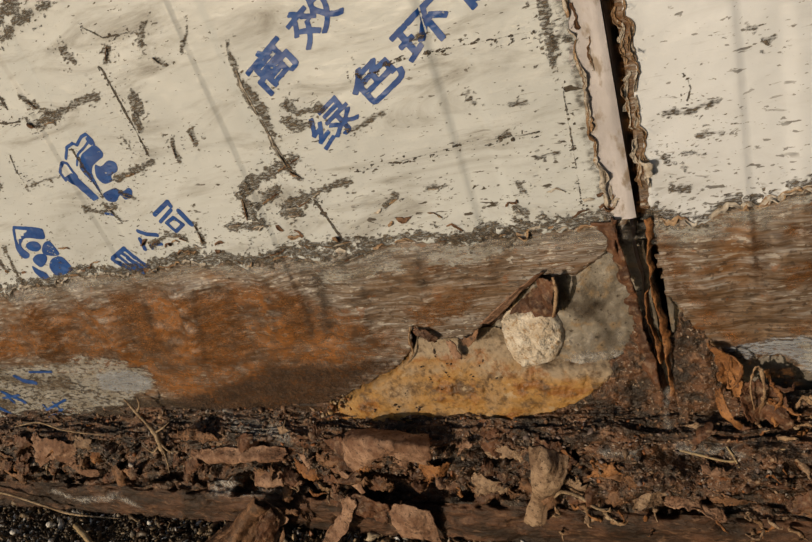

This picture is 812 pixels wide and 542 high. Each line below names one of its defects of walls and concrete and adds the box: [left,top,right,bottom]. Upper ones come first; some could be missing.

spalling [0,0,670,422]
peeling [638,174,812,243]
rust [0,286,812,542]